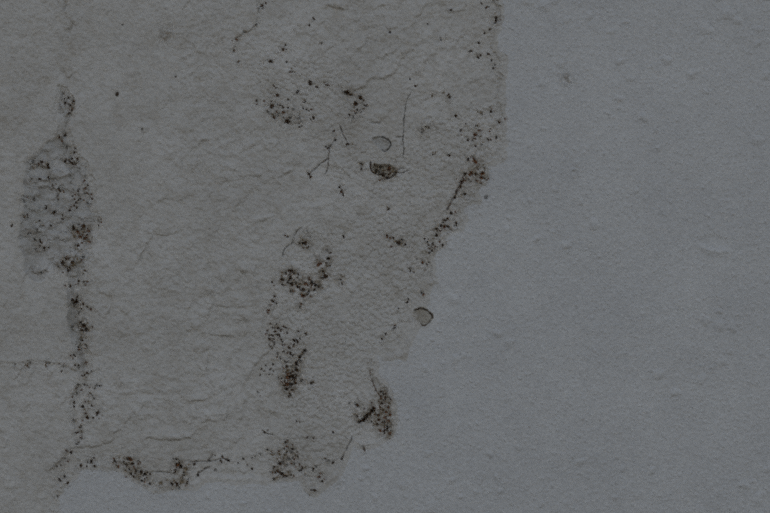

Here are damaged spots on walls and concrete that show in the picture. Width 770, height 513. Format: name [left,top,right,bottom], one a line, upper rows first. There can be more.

peeling [0,0,510,513]